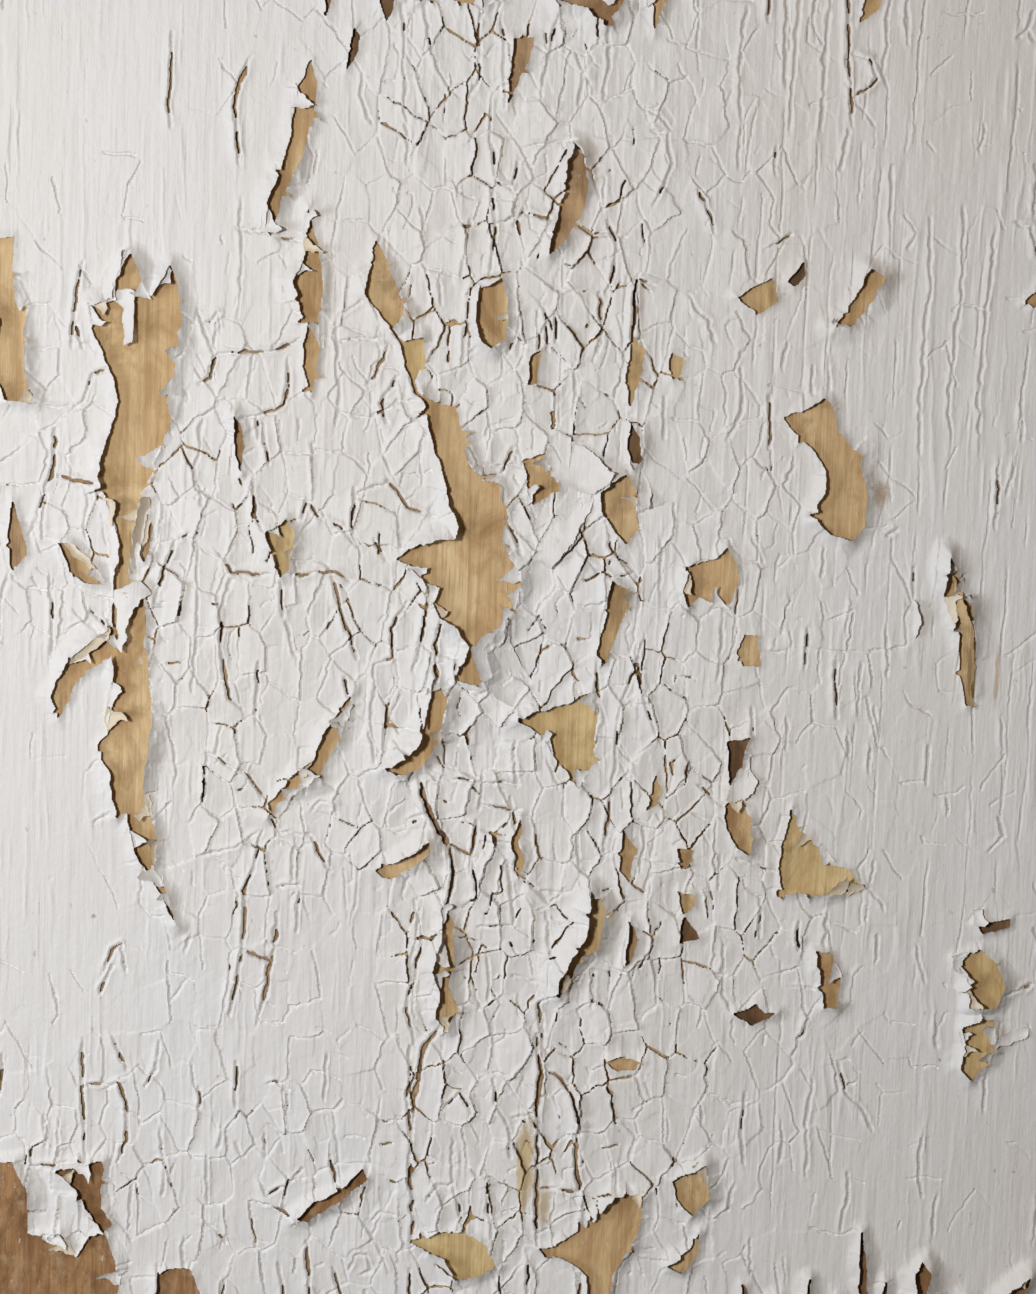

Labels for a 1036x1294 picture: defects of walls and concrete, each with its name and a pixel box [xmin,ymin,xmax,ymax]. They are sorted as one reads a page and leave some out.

peeling [0,219,201,940]
crack [163,29,177,130]
crack [212,52,281,167]
crack [0,164,923,1294]
peeling [252,0,679,411]
peeling [352,225,691,804]
crack [335,0,837,471]
peeling [765,381,885,557]
crack [827,0,893,224]
crack [915,197,1007,516]
peeling [0,1143,213,1294]
peeling [396,1149,722,1294]